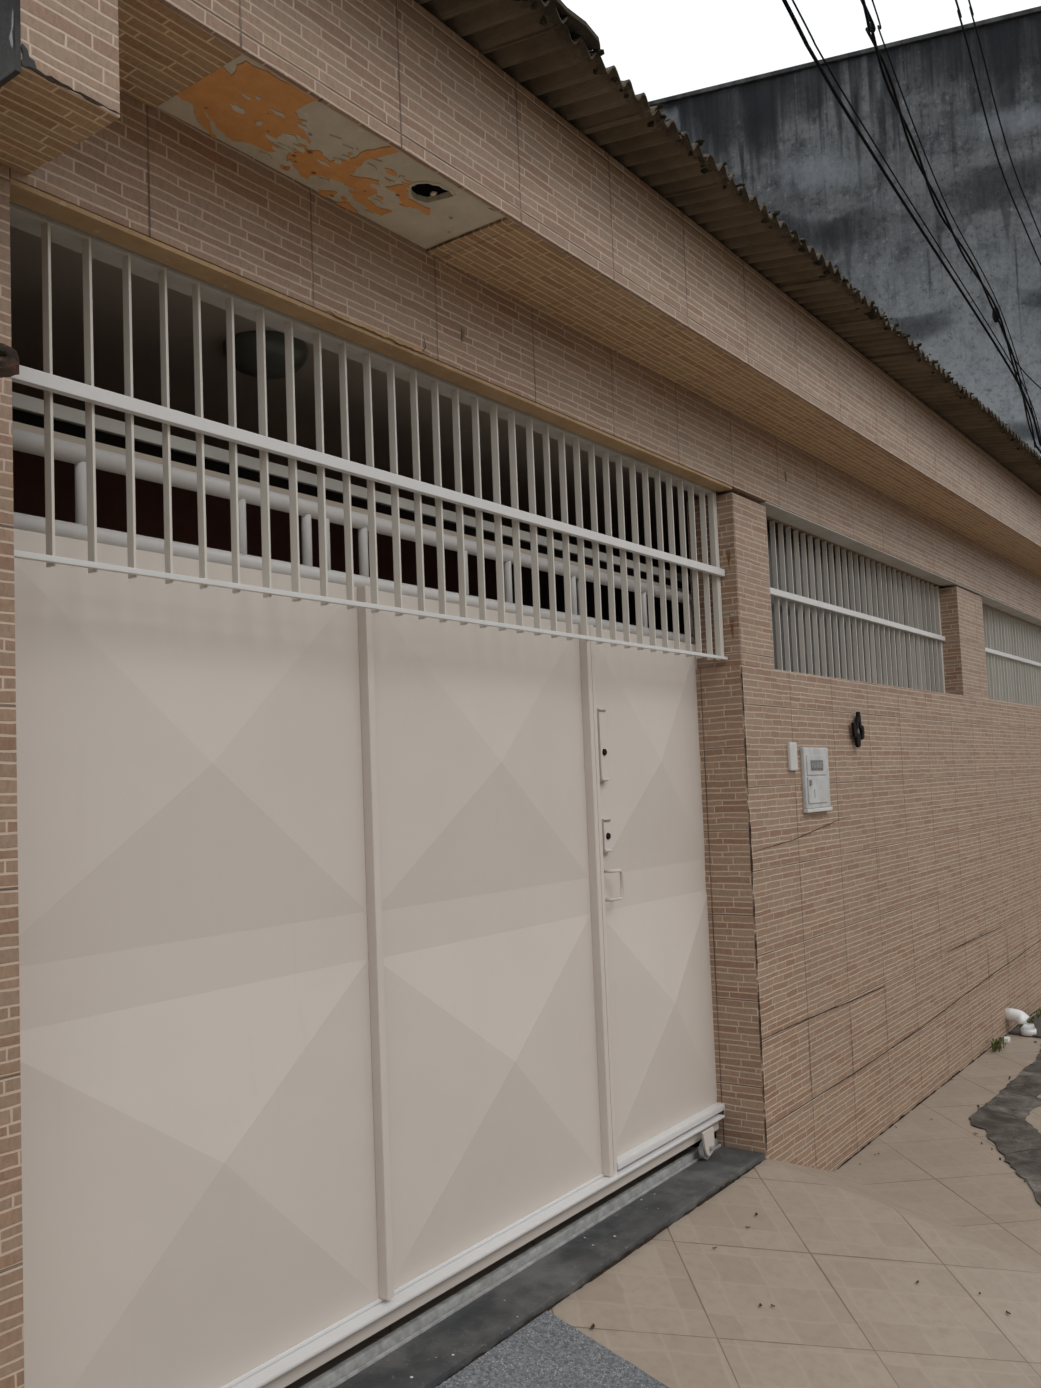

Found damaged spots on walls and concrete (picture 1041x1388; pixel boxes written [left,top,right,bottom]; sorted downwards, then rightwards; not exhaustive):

peeling [158,54,504,251]